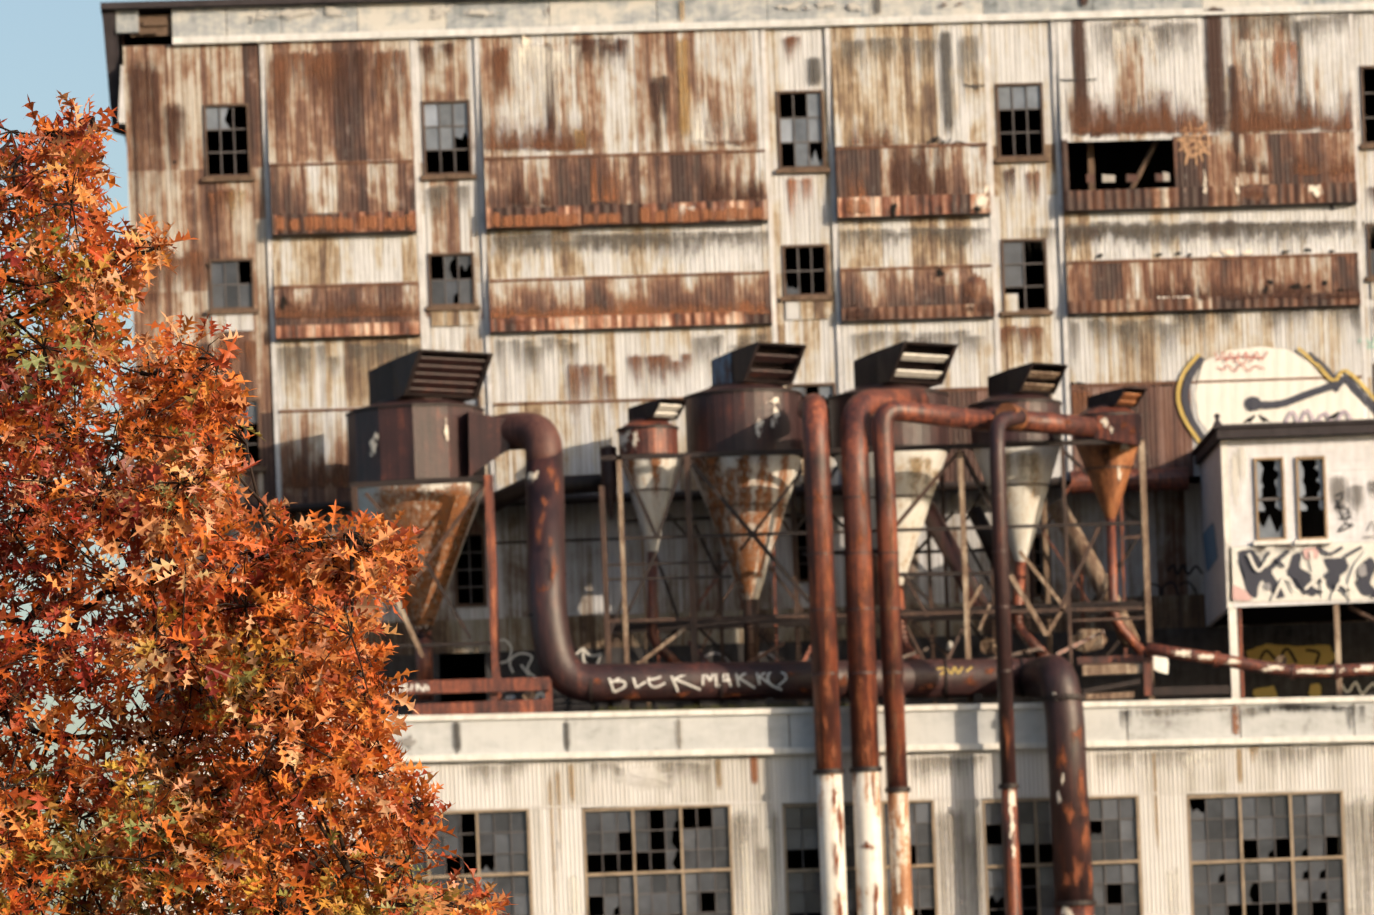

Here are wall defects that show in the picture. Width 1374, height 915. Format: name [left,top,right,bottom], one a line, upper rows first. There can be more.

corrosion [129,60,186,208]
corrosion [275,214,416,231]
corrosion [270,42,454,127]
corrosion [473,43,620,228]
corrosion [573,37,628,71]
corrosion [652,74,670,145]
corrosion [640,175,764,225]
corrosion [852,126,947,200]
corrosion [1069,40,1359,137]
corrosion [692,455,790,598]
peeling [832,788,843,875]
peeling [894,797,912,915]